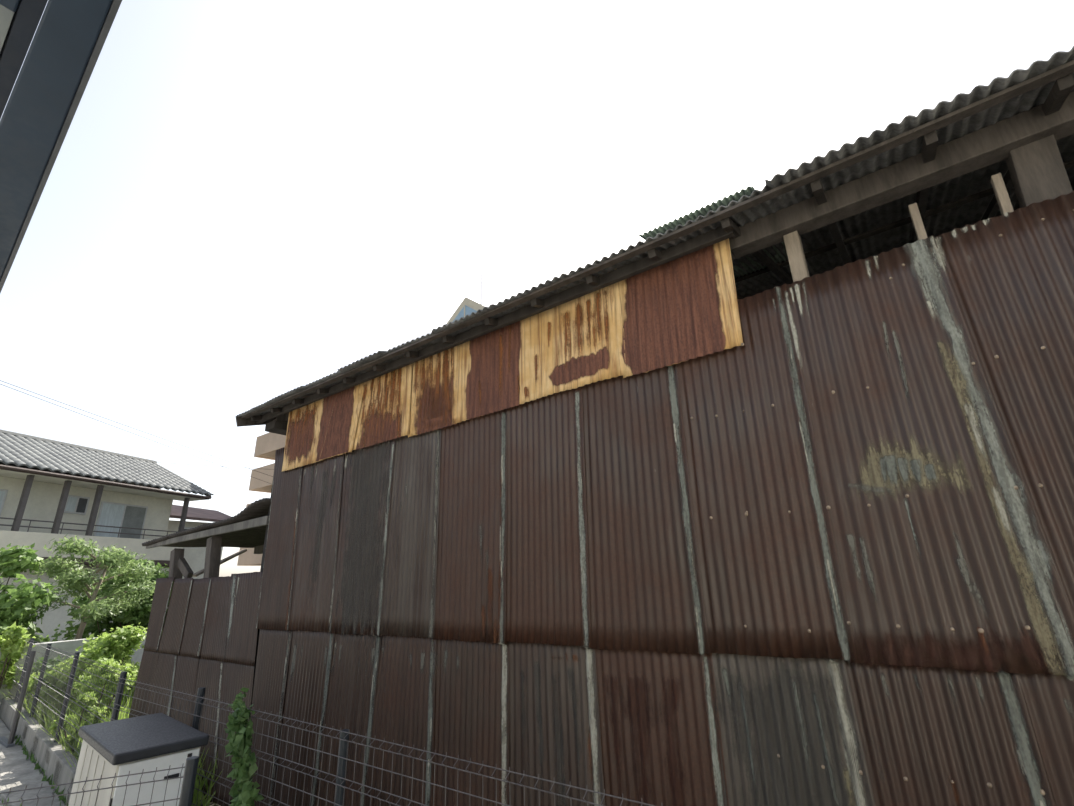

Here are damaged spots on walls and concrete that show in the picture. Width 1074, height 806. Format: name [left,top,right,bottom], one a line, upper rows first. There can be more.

rust [415,245,726,434]
rust [285,368,402,465]
water stain [848,437,970,551]
water stain [953,532,983,606]
water stain [715,661,858,806]